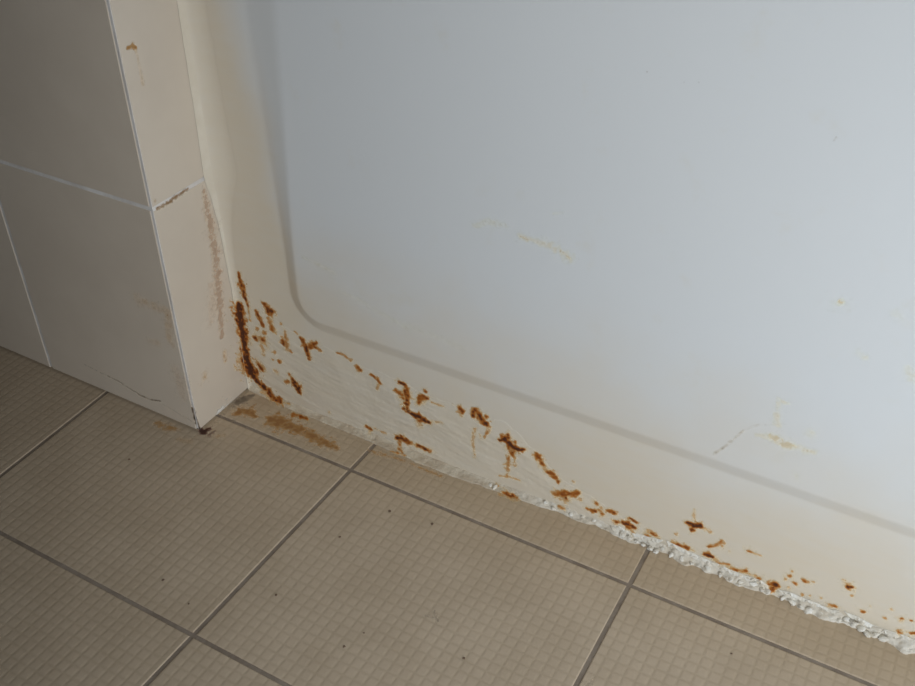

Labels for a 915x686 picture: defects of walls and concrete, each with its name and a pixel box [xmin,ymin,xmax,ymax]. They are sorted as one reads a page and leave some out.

rust [230,271,339,451]
rust [336,352,382,390]
rust [393,380,441,426]
rust [364,425,432,461]
peeling [610,523,915,653]